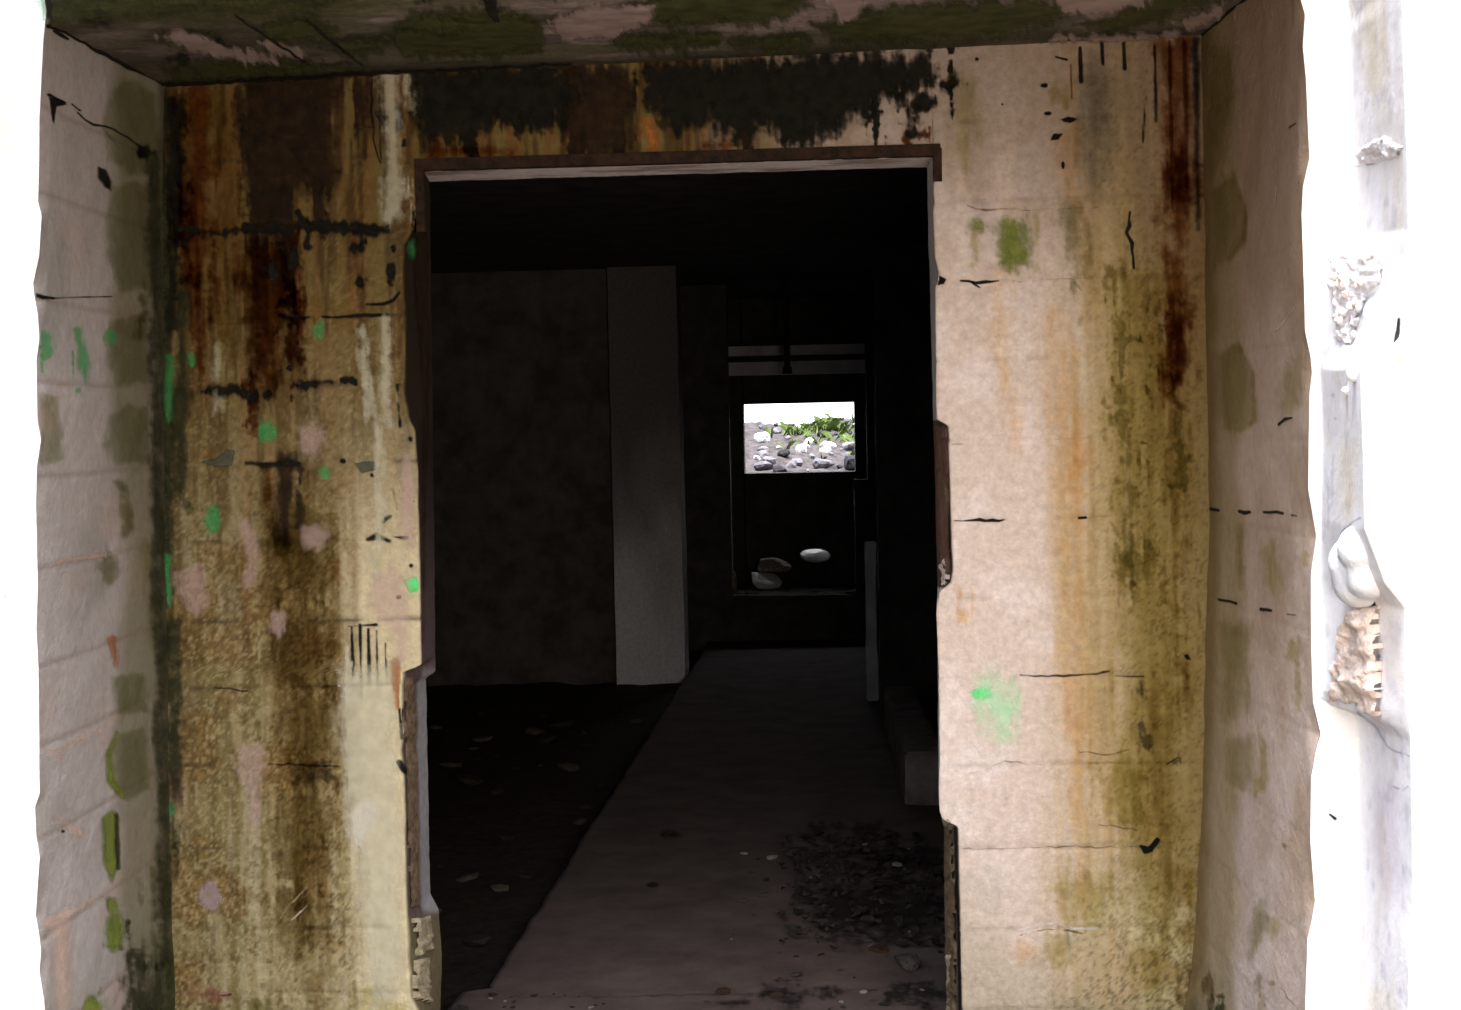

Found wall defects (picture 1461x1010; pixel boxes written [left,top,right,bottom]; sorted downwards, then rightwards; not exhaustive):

damp [1071,46,1083,87]
damp [234,47,959,306]
damp [137,97,194,509]
damp [386,211,430,462]
spalling [1327,247,1383,345]
damp [266,452,305,546]
damp [167,619,183,799]
damp [348,623,388,698]
damp [1139,722,1152,749]
spalling [1327,605,1383,717]